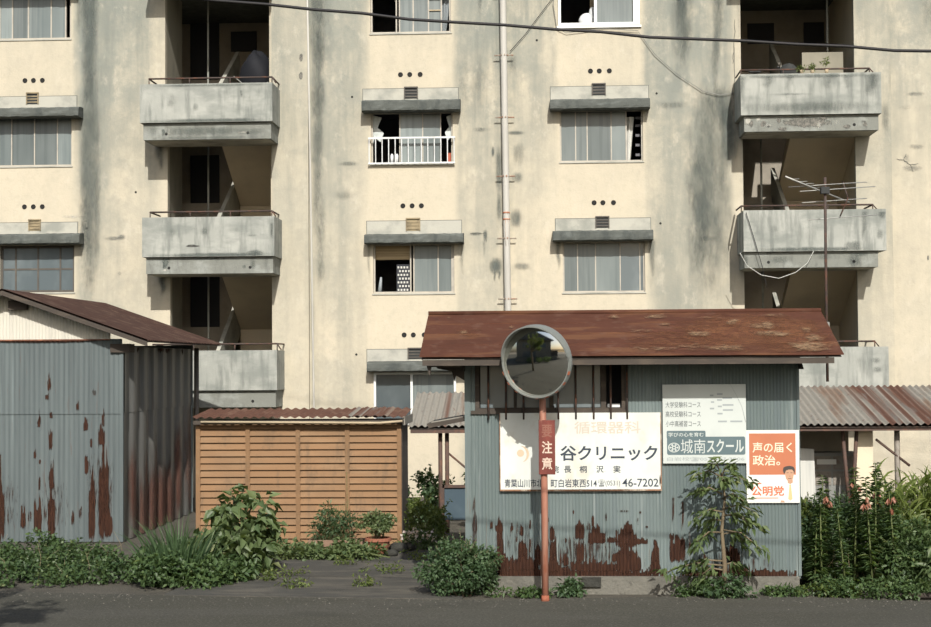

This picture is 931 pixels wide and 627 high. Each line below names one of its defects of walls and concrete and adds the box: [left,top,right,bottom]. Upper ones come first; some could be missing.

water stain [84,0,95,83]
water stain [678,0,686,35]
water stain [717,96,735,157]
water stain [83,104,98,242]
water stain [697,138,723,233]
corrosion [656,313,826,351]
corrosion [0,409,114,542]
corrosion [128,430,191,534]
corrosion [490,510,797,576]